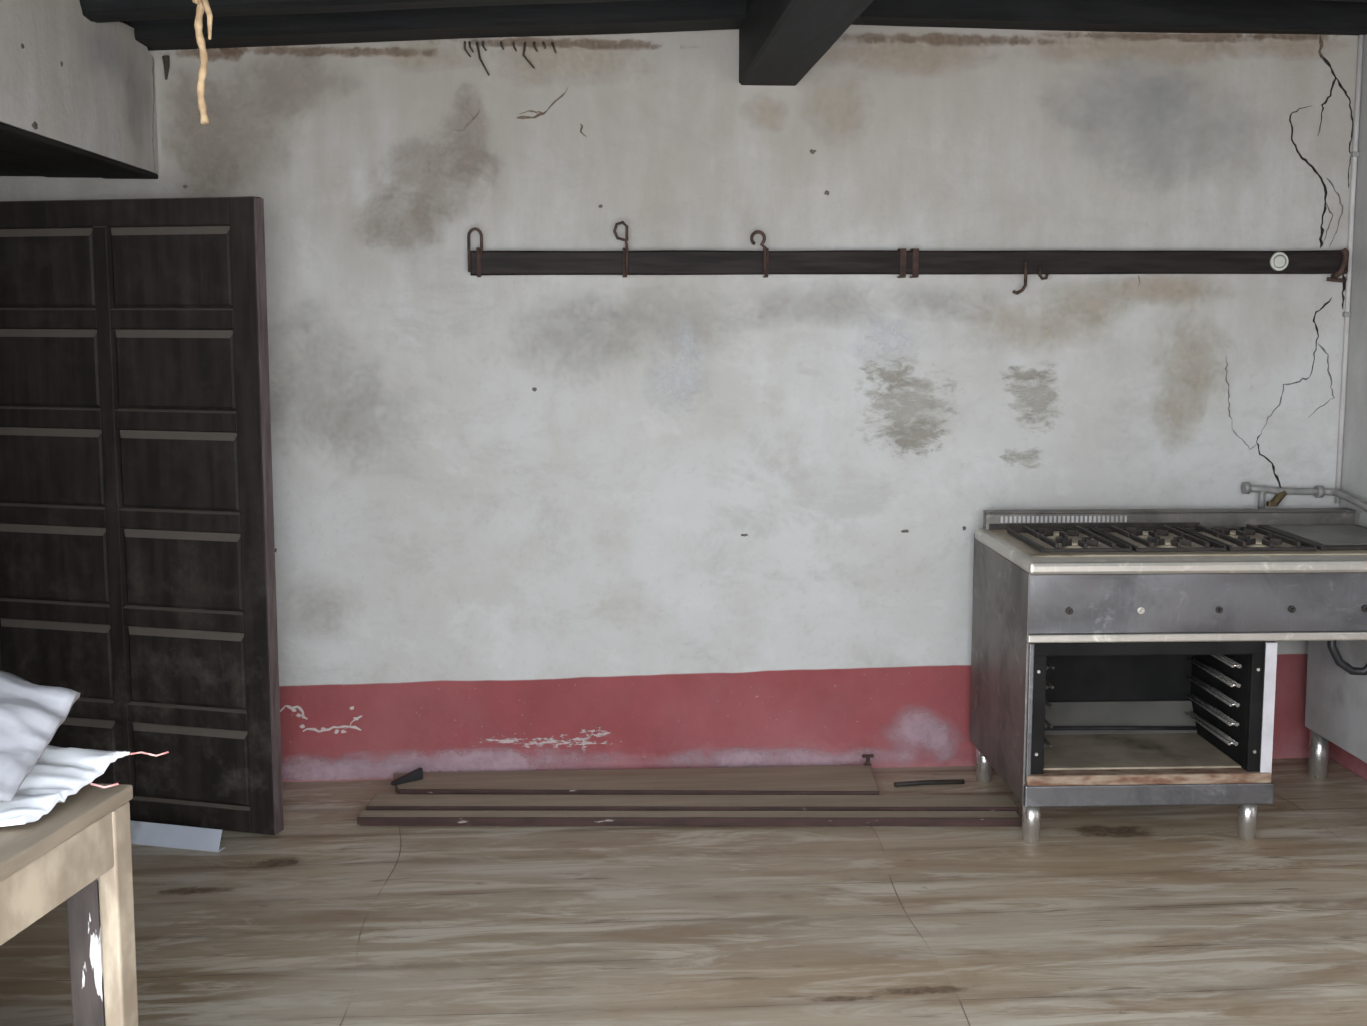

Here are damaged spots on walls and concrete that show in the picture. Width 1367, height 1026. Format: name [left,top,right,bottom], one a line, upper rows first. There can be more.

crack [1225,35,1353,488]
peeling [280,705,362,734]
peeling [480,727,621,750]
damp [894,713,951,759]
damp [715,750,874,767]